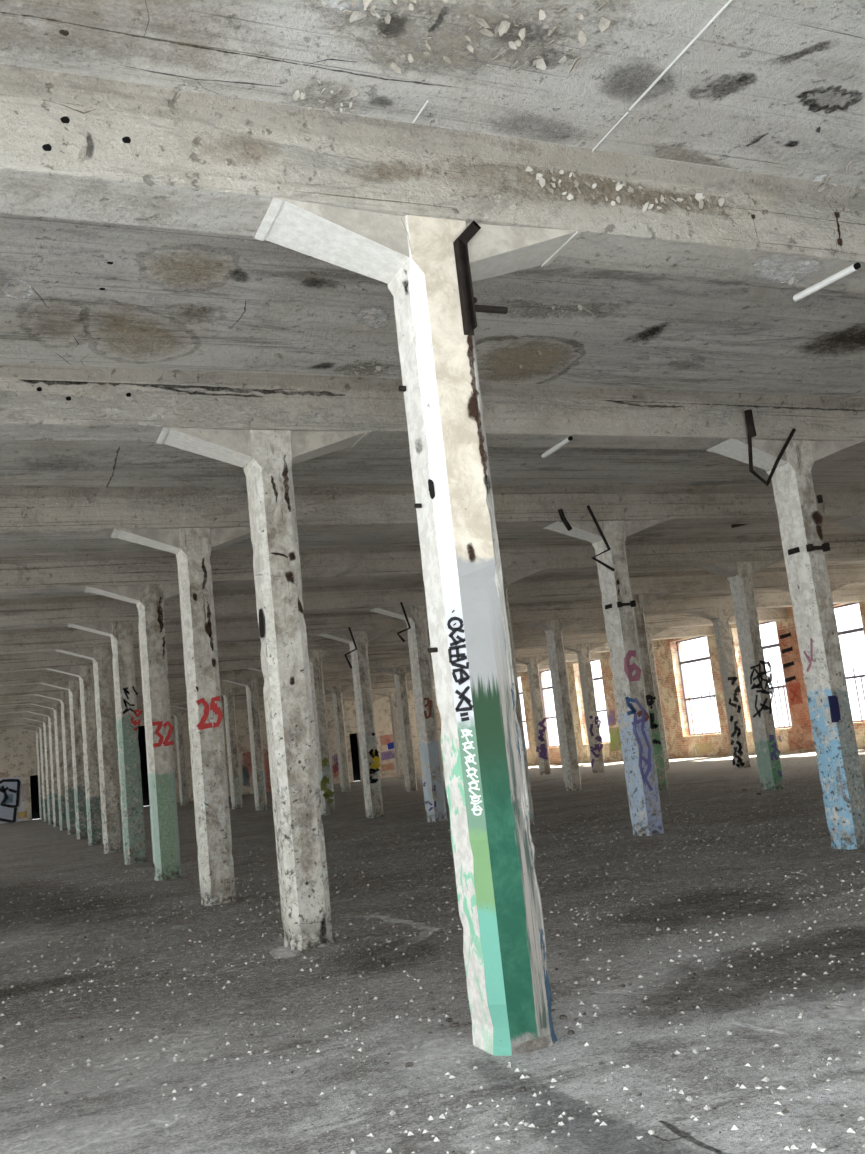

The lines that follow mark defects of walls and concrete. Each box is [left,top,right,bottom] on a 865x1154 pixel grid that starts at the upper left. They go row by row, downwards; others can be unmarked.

peeling [311,0,625,74]
water stain [705,75,749,100]
water stain [797,86,861,114]
peeling [525,166,724,212]
water stain [805,324,865,354]
crack [647,1120,723,1154]